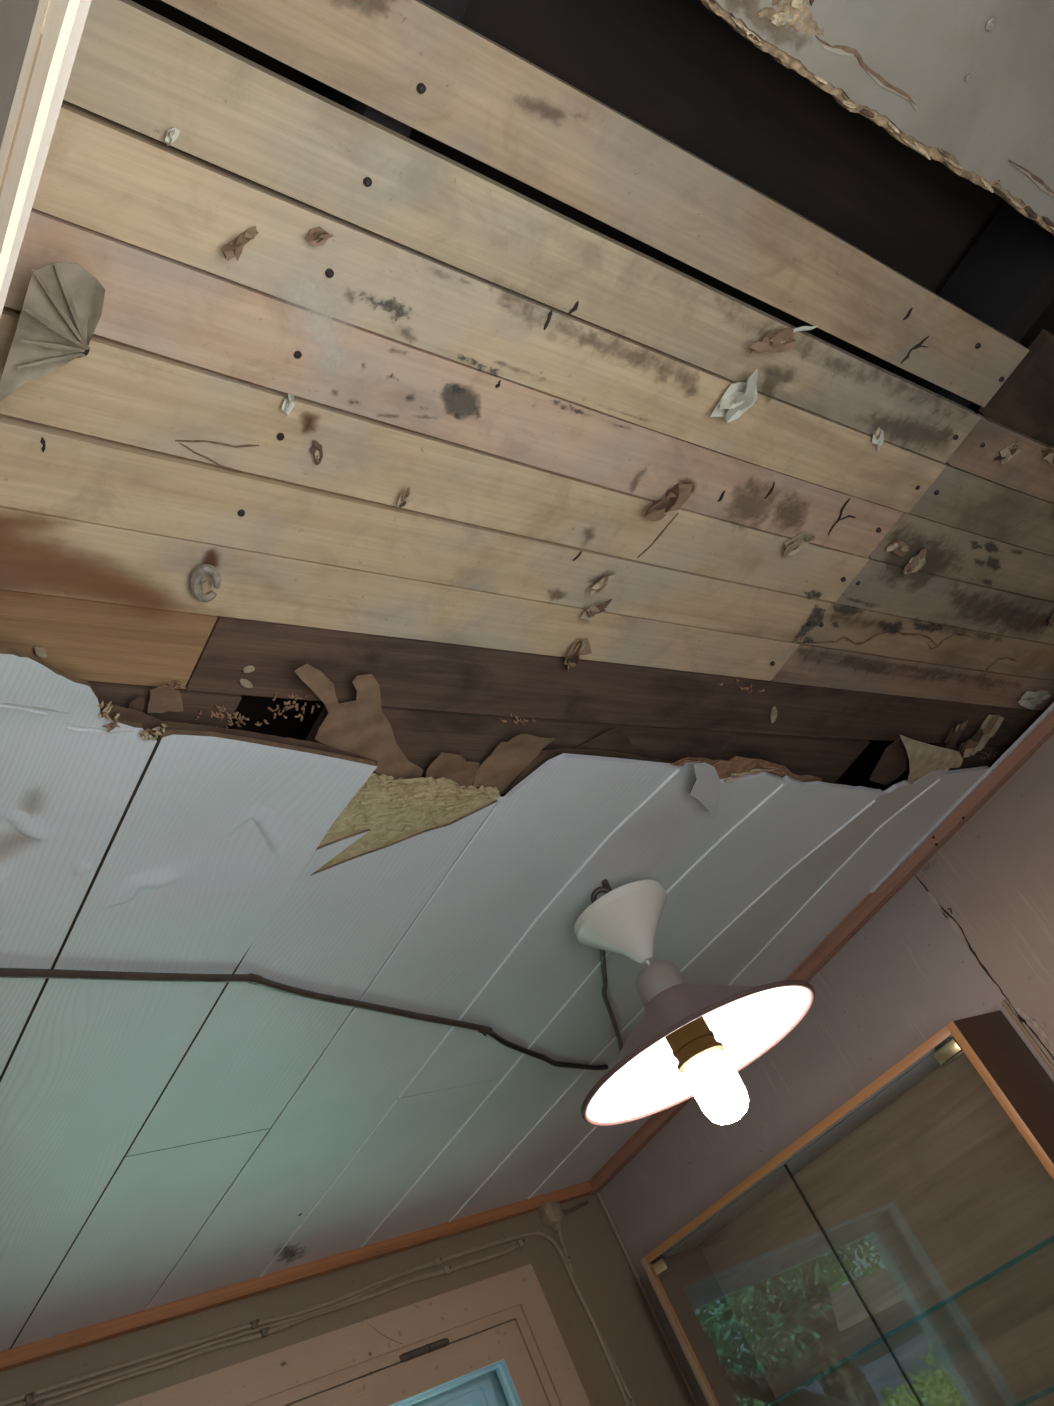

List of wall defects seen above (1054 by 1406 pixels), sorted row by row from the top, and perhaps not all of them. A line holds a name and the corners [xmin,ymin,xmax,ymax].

crack [815,35,917,112]
spalling [701,0,1054,236]
crack [1009,160,1054,197]
leakage [444,384,479,418]
crack [828,498,856,536]
peeling [366,778,425,787]
peeling [689,762,720,818]
peeling [869,735,963,785]
crack [918,879,1054,1060]